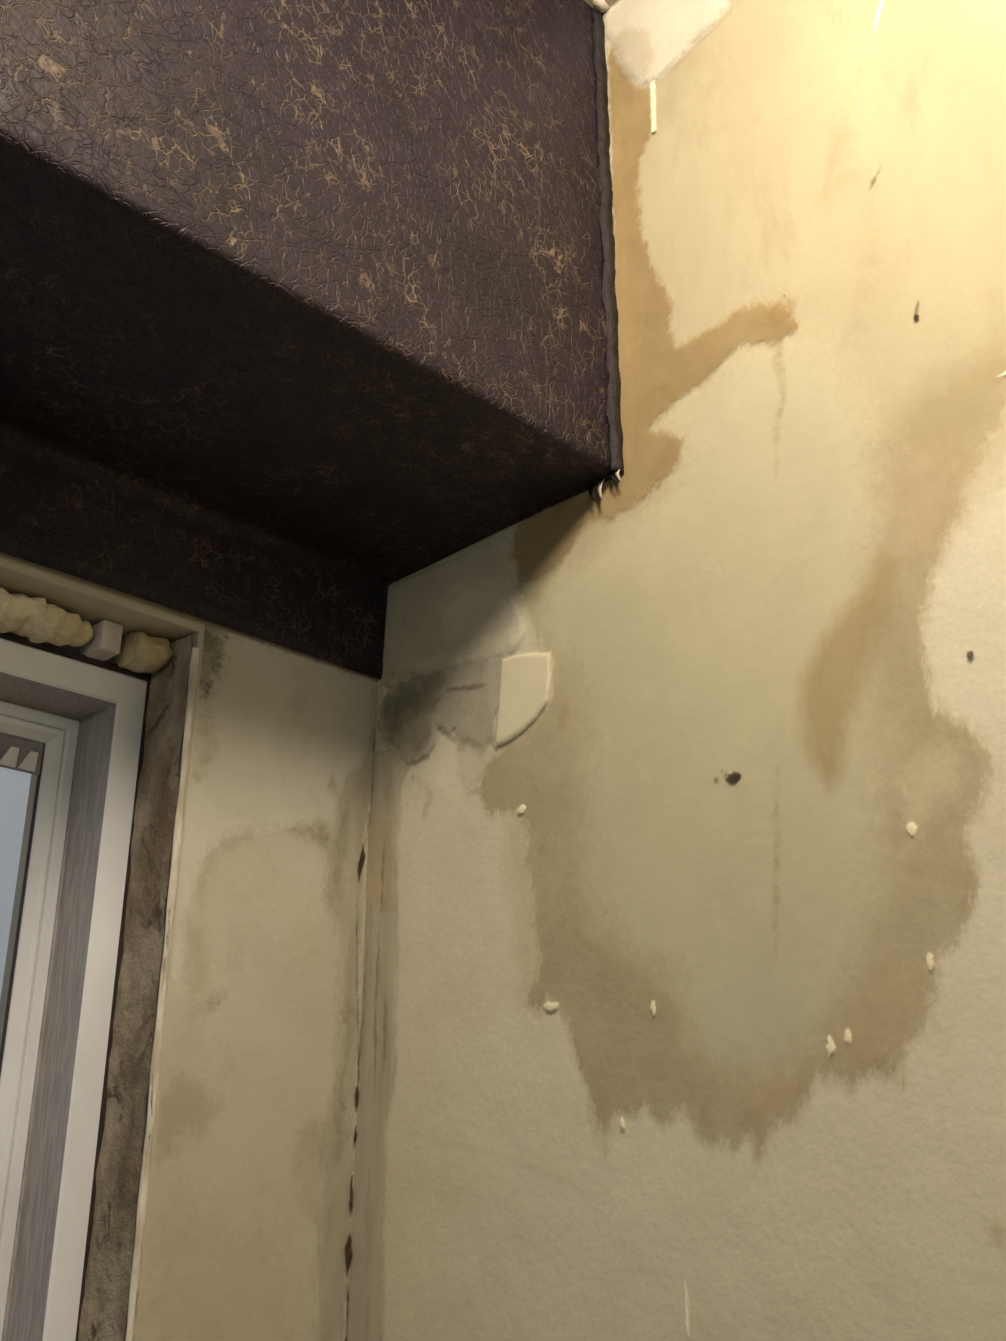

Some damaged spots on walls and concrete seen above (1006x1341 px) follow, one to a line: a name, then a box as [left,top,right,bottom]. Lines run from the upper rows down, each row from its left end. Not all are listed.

peeling [610,0,1006,548]
peeling [495,653,550,744]
damp [481,50,992,1156]